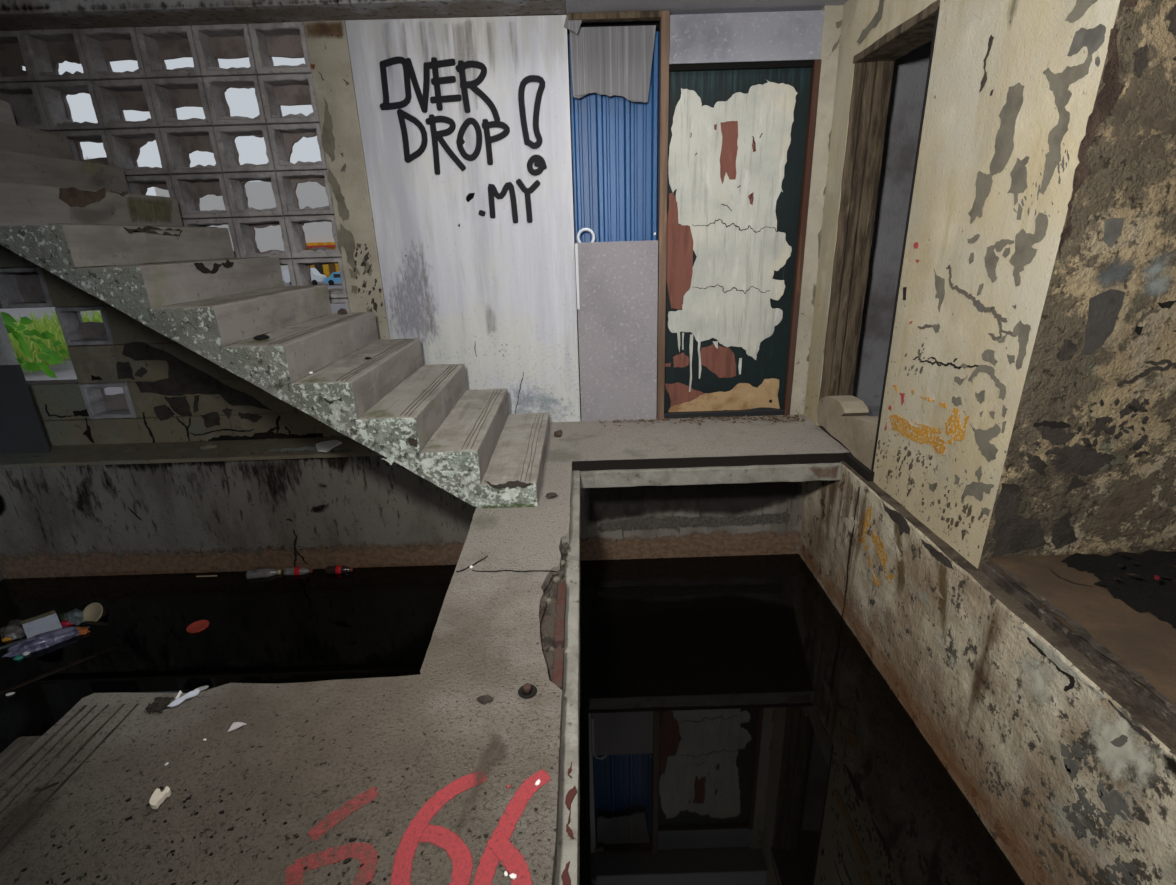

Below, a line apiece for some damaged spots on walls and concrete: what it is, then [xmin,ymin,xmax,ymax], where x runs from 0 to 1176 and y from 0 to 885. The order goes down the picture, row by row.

peeling [714,121,738,184]
peeling [967,0,1125,312]
crack [946,264,1017,341]
crack [913,324,979,369]
crack [143,412,155,443]
crack [177,415,323,441]
water stain [75,461,225,516]
spalling [0,440,476,578]
water stain [0,518,464,579]
spalling [539,304,1176,885]
water stain [971,616,998,703]
water stain [1088,707,1176,791]